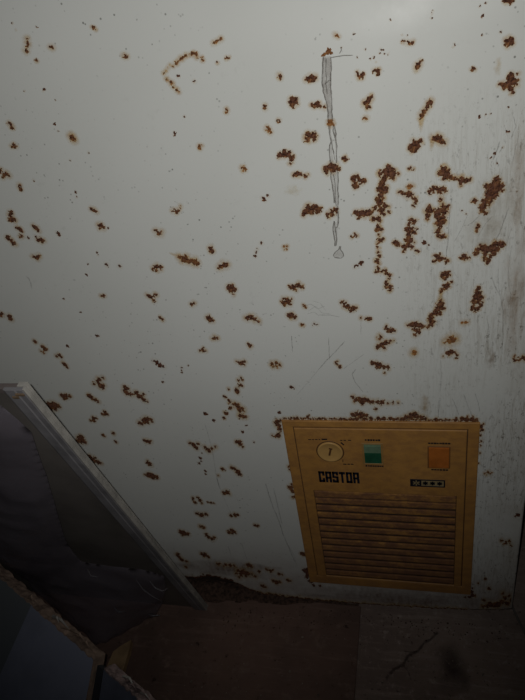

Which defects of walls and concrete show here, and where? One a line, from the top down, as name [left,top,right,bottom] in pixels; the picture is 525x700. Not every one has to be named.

rust [163,51,205,93]
rust [498,71,519,94]
rust [276,149,309,178]
rust [470,175,505,216]
rust [350,163,472,292]
rust [177,254,200,266]
rust [458,239,506,265]
rust [406,252,453,337]
rust [470,286,484,313]
rust [123,385,149,403]
rust [271,395,485,464]
rust [175,552,467,610]